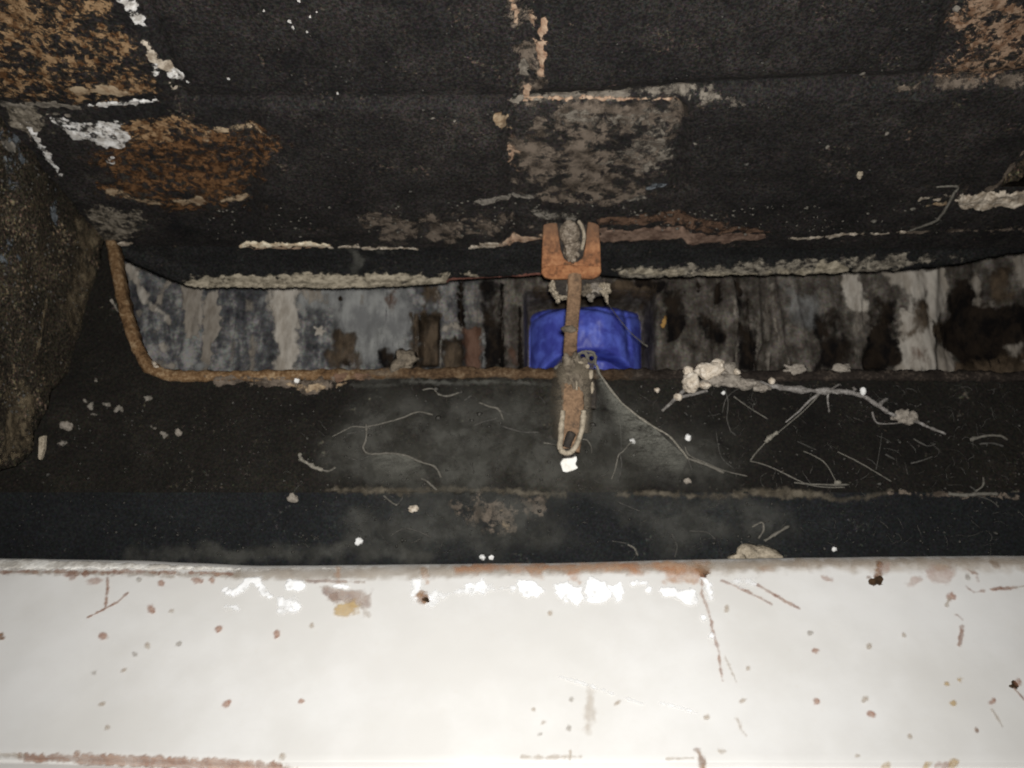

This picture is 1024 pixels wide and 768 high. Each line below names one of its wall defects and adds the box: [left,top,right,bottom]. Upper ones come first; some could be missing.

flaking render [0,0,189,142]
flaking render [925,0,1024,82]
spalling [179,0,746,289]
flaking render [65,115,283,336]
water stain [125,262,222,371]
water stain [246,280,523,385]
water stain [813,271,869,371]
water stain [881,266,956,372]
rust [310,580,368,616]
rust [410,578,439,607]
rust [653,561,709,581]
rust [19,752,282,768]